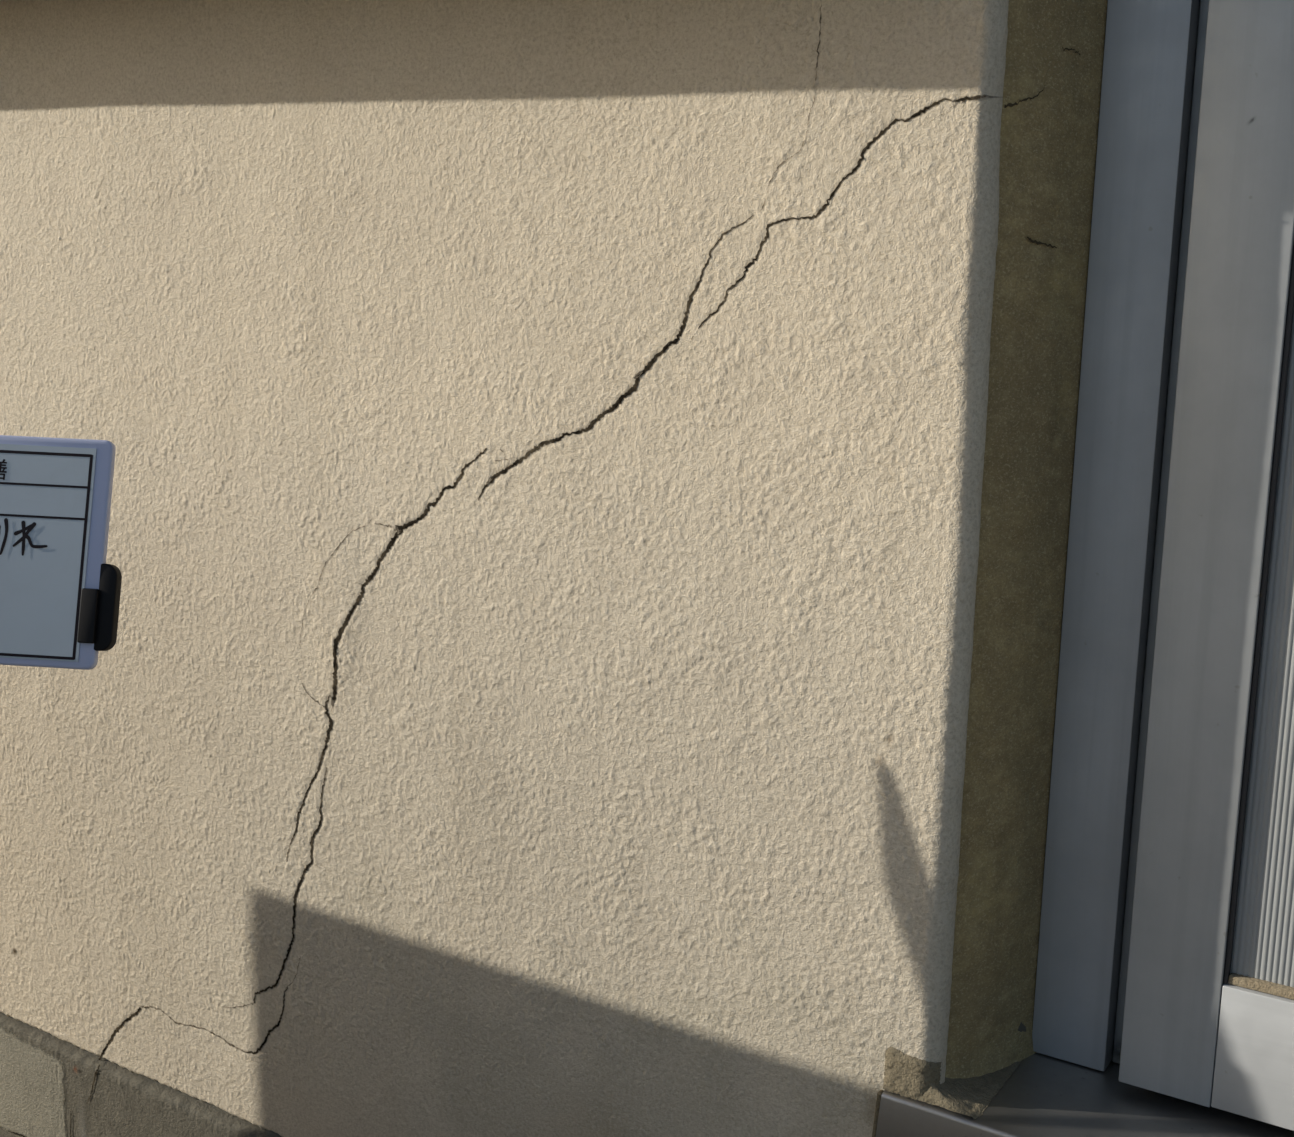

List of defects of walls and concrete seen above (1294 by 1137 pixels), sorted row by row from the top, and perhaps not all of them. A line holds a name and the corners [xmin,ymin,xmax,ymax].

crack [68,7,1045,1137]